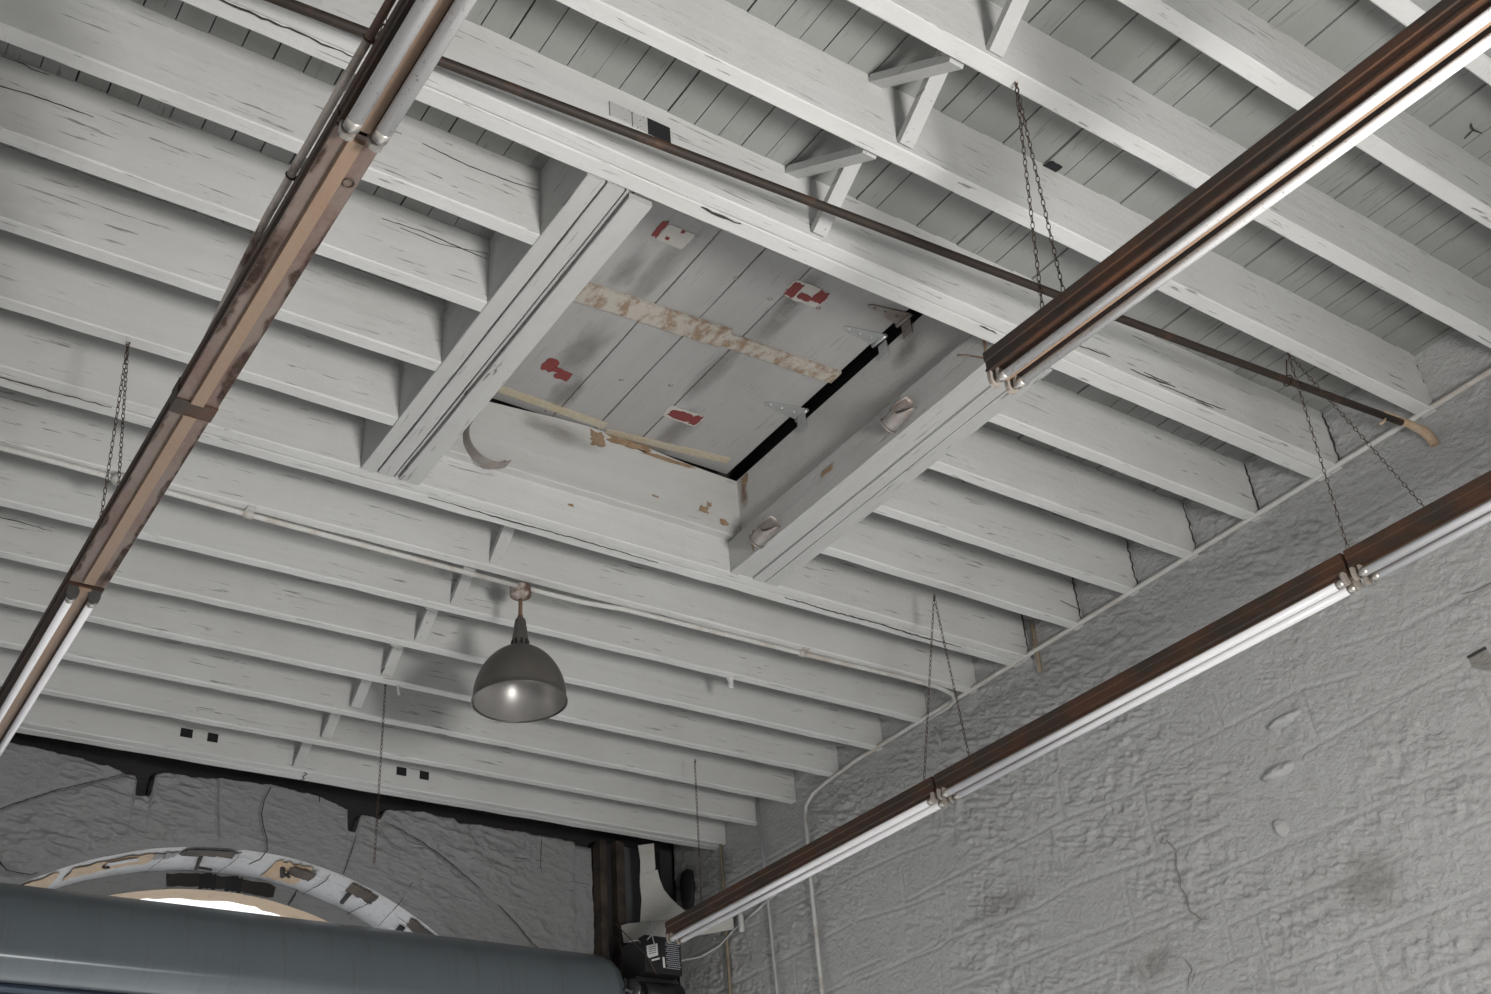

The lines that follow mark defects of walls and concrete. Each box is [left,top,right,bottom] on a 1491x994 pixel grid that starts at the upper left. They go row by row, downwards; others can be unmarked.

crack [220,0,353,57]
peeling [784,282,830,304]
spalling [1467,646,1491,670]